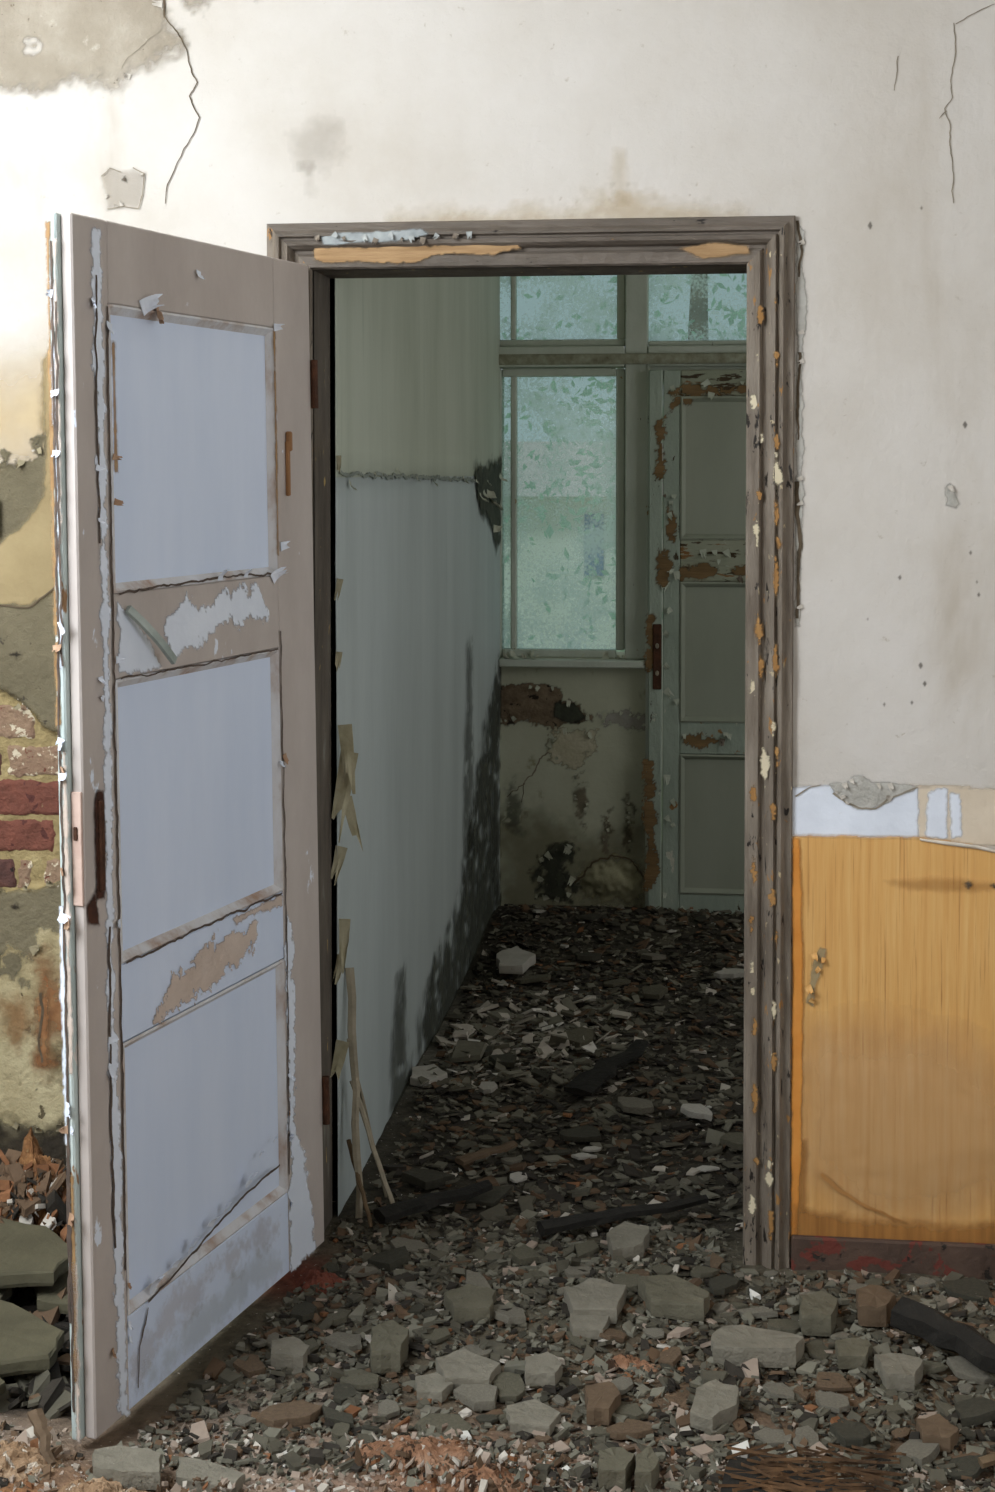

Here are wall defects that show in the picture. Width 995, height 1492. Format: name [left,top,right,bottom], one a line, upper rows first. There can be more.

spalling [0,0,185,93]
crack [122,0,200,204]
crack [940,4,994,203]
spalling [0,434,61,543]
spalling [500,683,645,730]
peeling [573,774,589,818]
spalling [0,590,74,1143]
spalling [532,841,582,903]
peeling [748,722,995,1240]